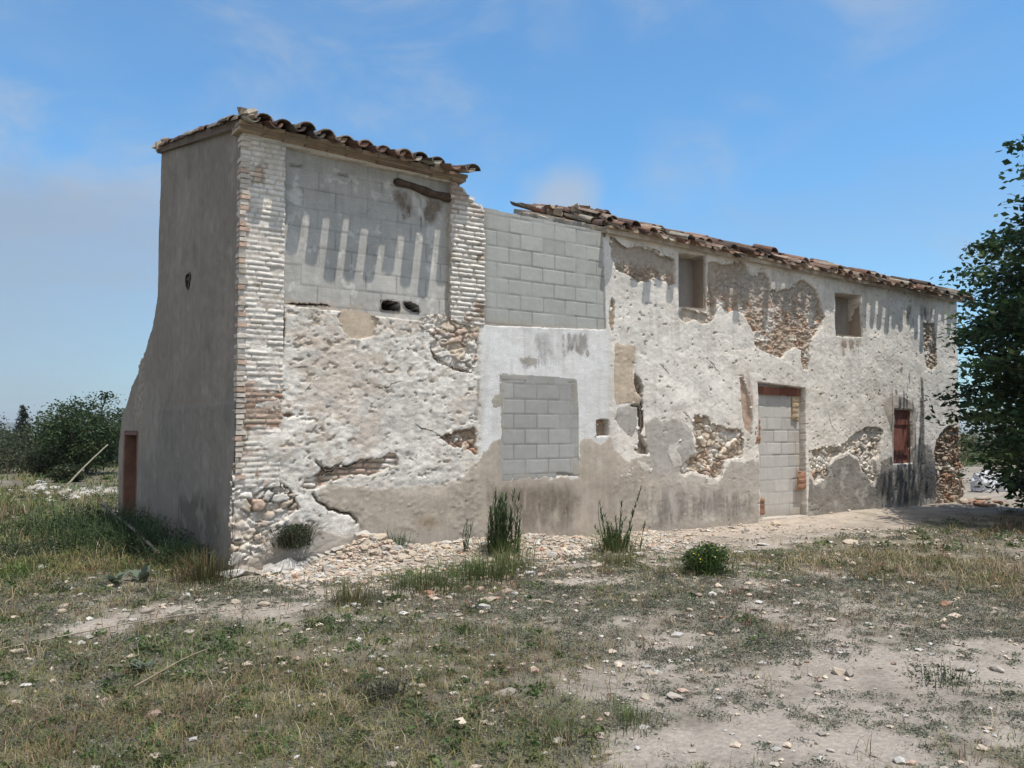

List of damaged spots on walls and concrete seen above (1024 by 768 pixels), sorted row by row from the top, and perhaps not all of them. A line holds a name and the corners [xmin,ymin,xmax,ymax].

flaking render [608,238,673,285]
flaking render [337,298,480,372]
flaking render [678,261,824,370]
flaking render [228,453,398,566]
crack [265,459,371,523]
flaking render [440,428,478,454]
flaking render [679,378,761,479]
flaking render [796,427,882,490]
water stain [877,378,937,501]
flaking render [934,425,966,504]